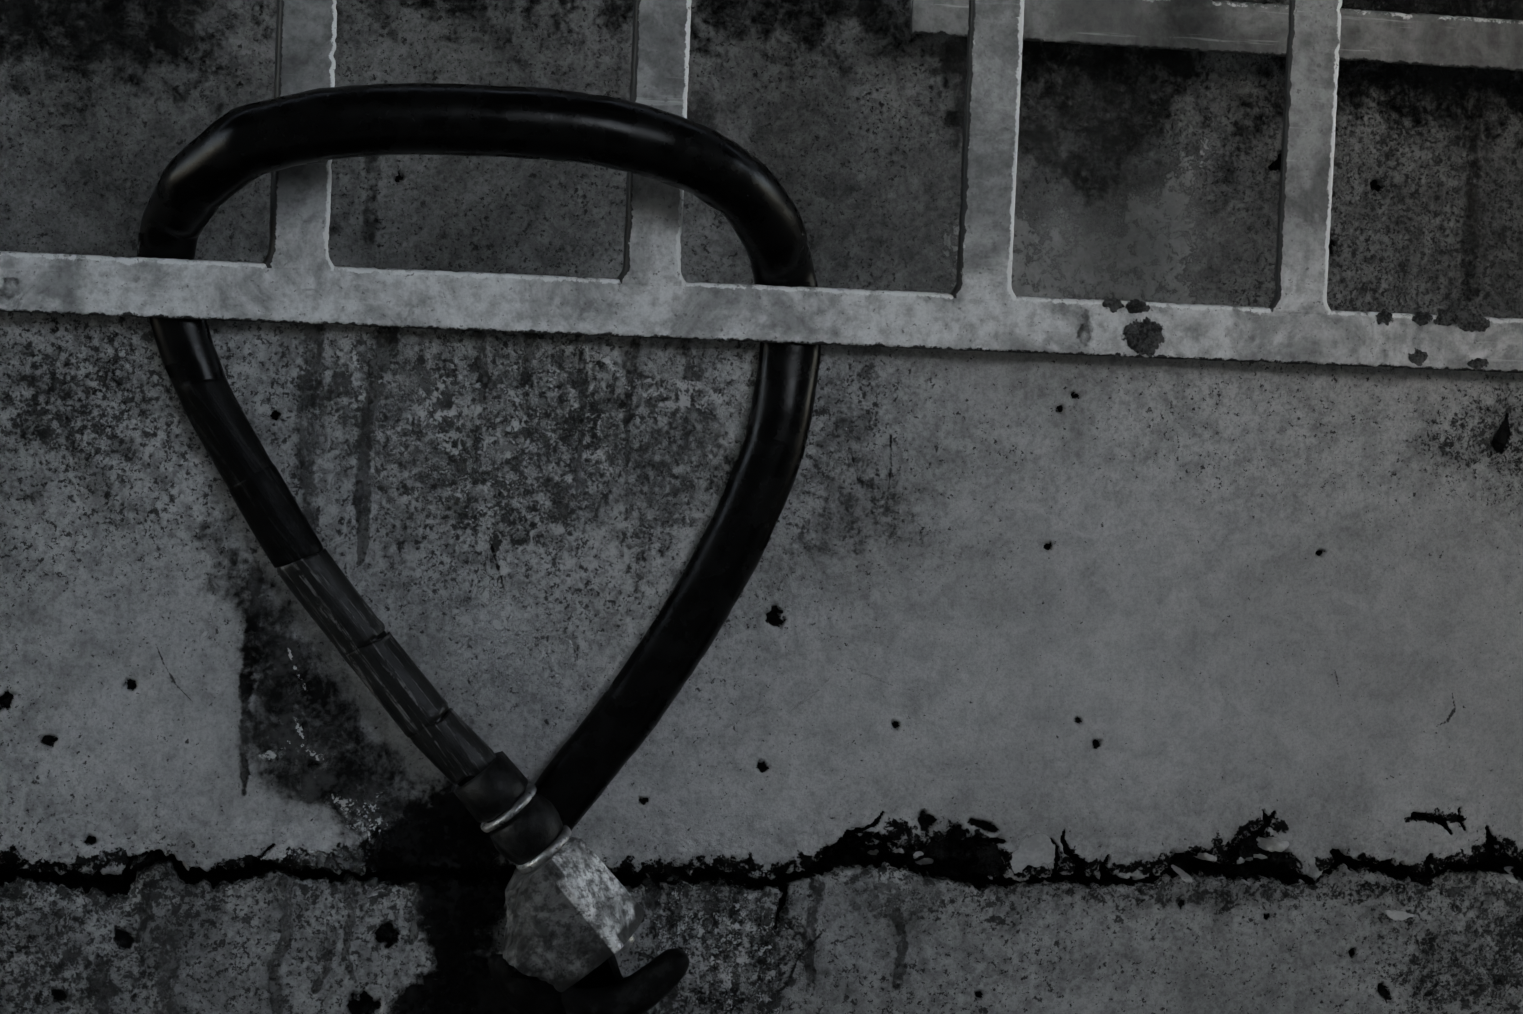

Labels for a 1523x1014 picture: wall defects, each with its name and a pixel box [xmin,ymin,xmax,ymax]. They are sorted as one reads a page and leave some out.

water stain [195,518,433,838]
crack [0,842,406,898]
crack [607,807,1523,920]
spalling [1167,831,1294,883]
spalling [1482,852,1523,884]
crack [773,932,822,995]